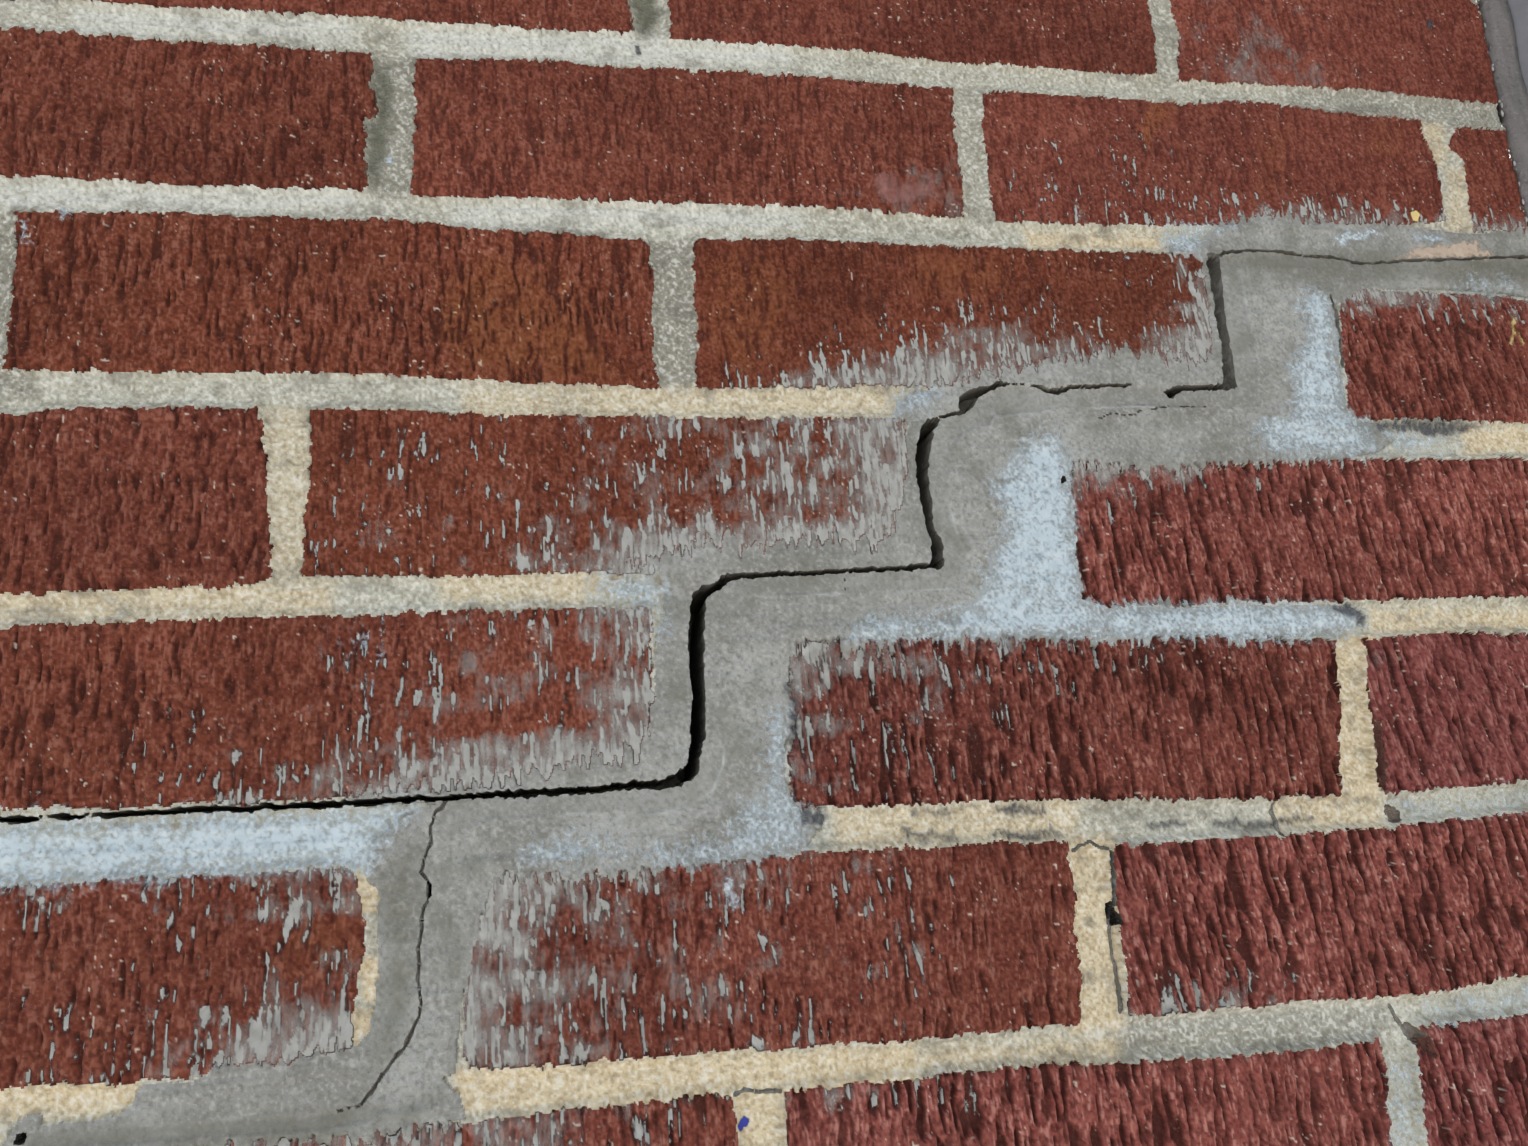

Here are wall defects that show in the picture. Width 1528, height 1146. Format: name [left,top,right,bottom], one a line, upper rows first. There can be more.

leakage [850,436,1365,643]
crack [0,249,1528,1114]
leakage [657,688,824,936]
leakage [0,805,408,1067]
leakage [461,842,831,1069]
leakage [831,869,857,908]
leakage [861,867,941,999]
leakage [26,987,176,1085]
leakage [346,1117,503,1146]
leakage [521,1107,583,1146]
leakage [622,1106,650,1146]
leakage [914,1073,976,1111]